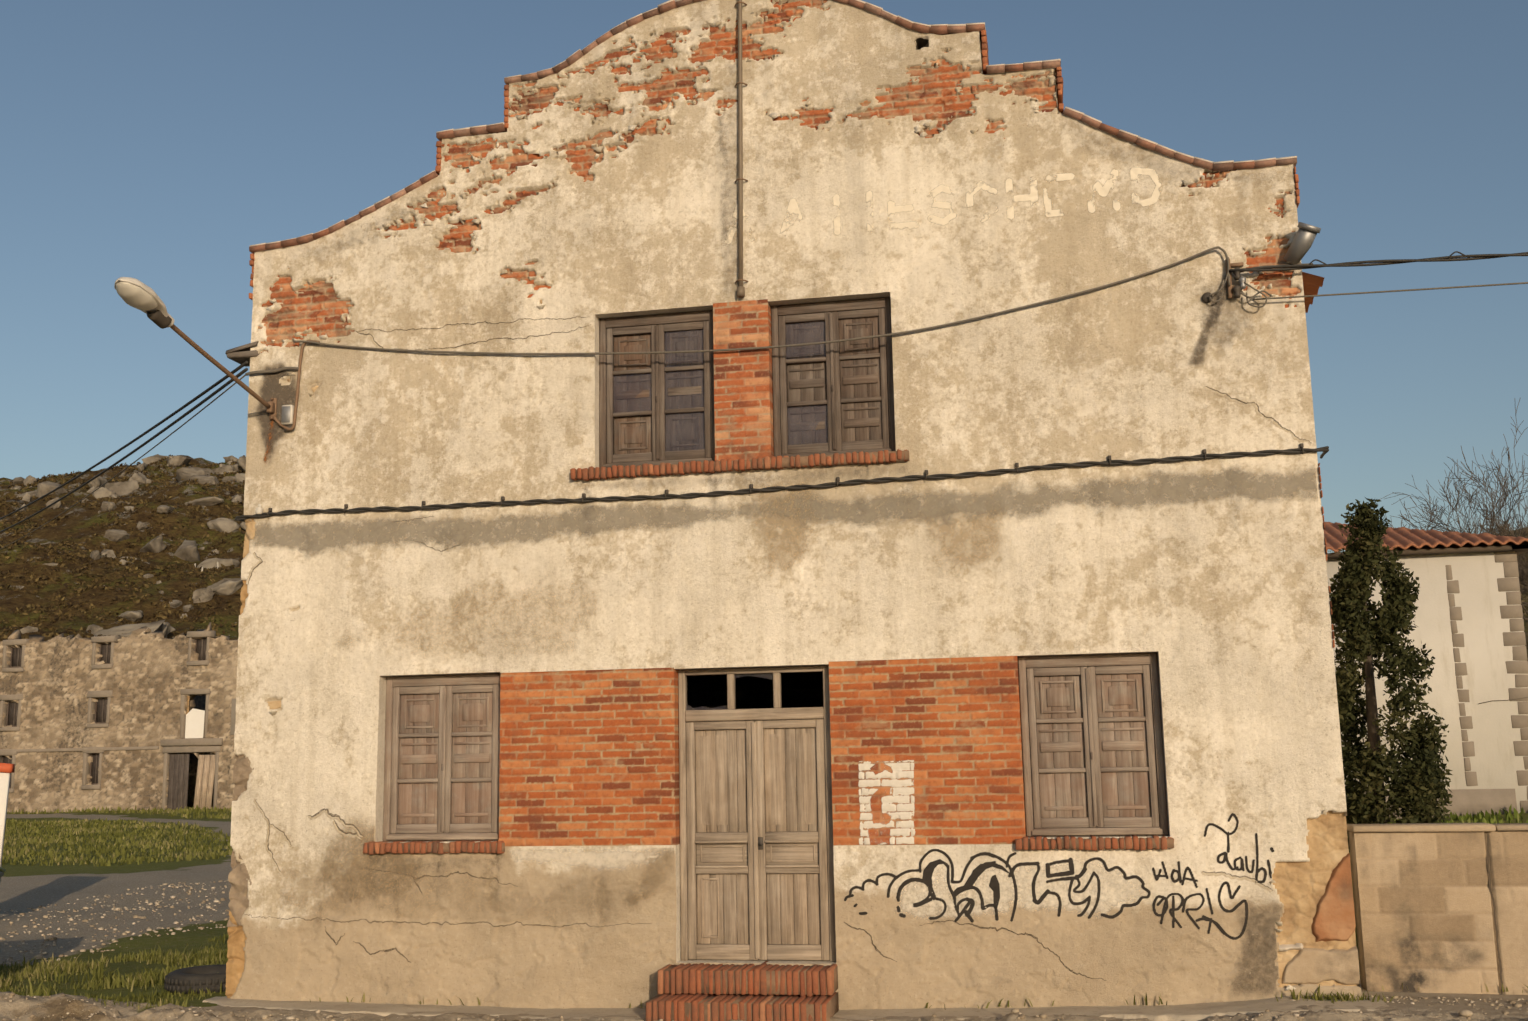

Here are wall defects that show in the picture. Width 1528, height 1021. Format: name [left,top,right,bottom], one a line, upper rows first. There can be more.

spalling [376,0,830,254]
spalling [766,38,1059,139]
spalling [257,268,355,353]
spalling [500,261,551,310]
spalling [1243,191,1301,308]
flaking render [225,843,252,998]
crack [245,798,647,962]
crack [844,922,897,962]
crack [919,920,1106,981]
flaking render [1269,809,1360,991]